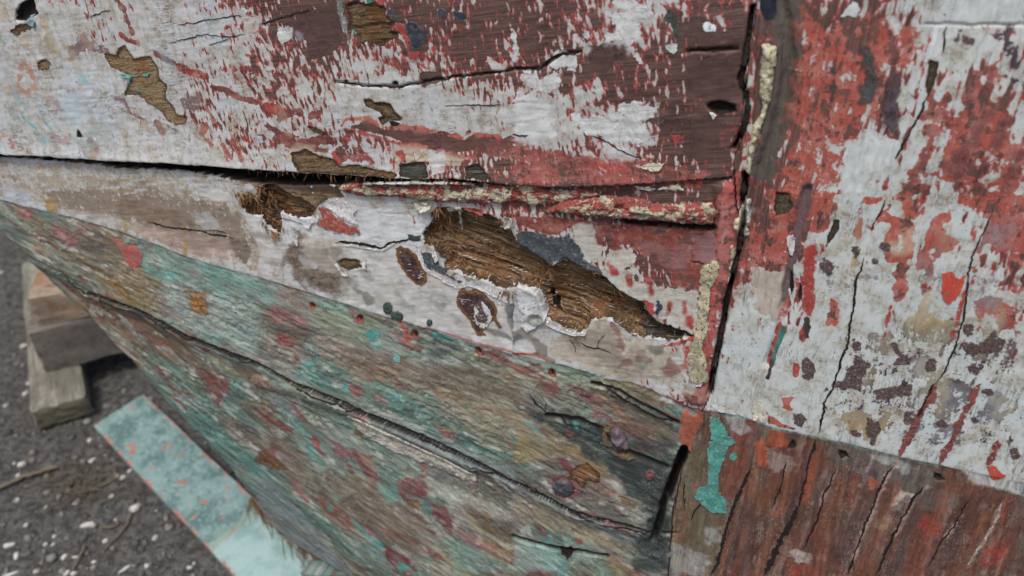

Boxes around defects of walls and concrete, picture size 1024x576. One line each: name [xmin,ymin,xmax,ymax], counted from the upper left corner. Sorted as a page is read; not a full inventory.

peeling [104,45,187,125]
peeling [337,0,428,61]
crack [337,51,581,106]
crack [57,274,257,367]
spalling [407,202,693,339]
crack [290,384,650,535]
crack [607,388,678,422]
crack [763,258,864,576]
crack [848,209,993,574]
crack [711,469,751,574]